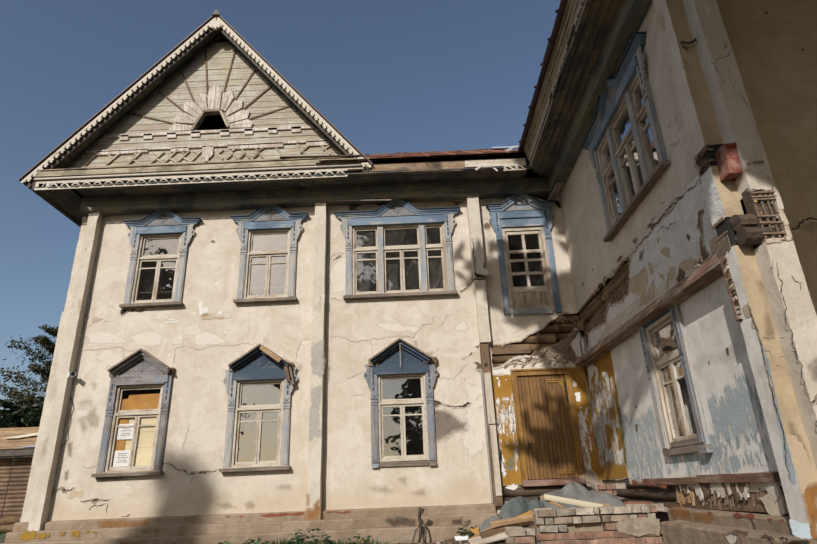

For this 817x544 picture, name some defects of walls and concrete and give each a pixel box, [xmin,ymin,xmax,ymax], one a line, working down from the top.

crack [460,241,485,292]
peeling [630,208,718,308]
crack [790,217,817,232]
crack [61,288,138,448]
spalling [462,312,586,387]
crack [52,487,111,511]
crack [163,454,223,481]
peeling [433,378,486,457]
peeling [494,393,519,490]
peeling [572,343,812,544]